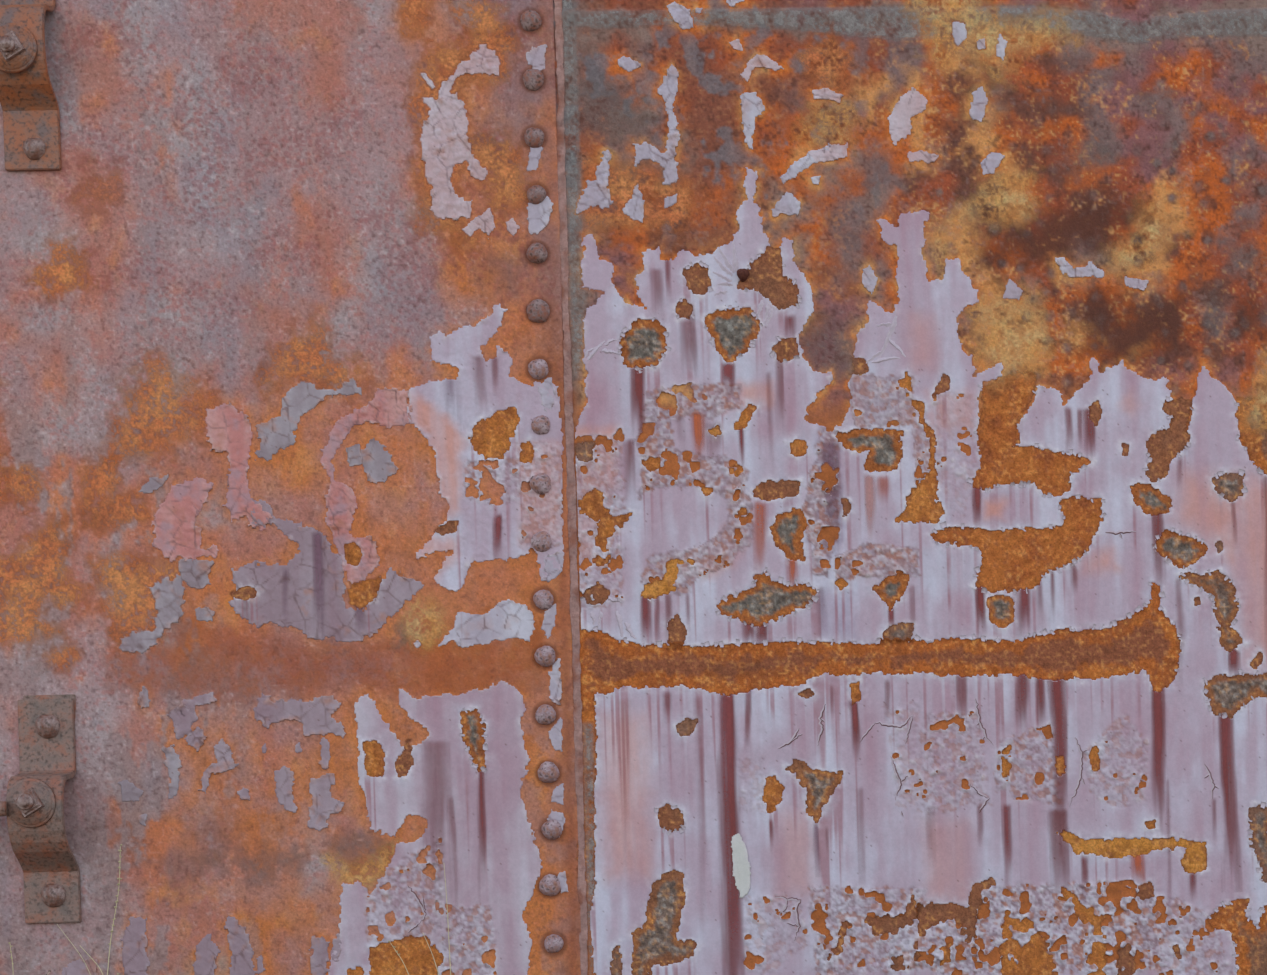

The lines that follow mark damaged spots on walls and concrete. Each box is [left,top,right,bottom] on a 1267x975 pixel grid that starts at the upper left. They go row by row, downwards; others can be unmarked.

peeling [420,44,553,240]
peeling [812,88,844,103]
peeling [969,86,988,122]
rust [79,357,217,534]
rust [0,521,187,643]
peeling [117,142,1267,975]
rust [976,587,985,618]
rust [721,694,750,975]
rust [851,702,859,742]
rust [1018,674,1067,796]
rust [1152,689,1164,799]
rust [1220,715,1236,847]